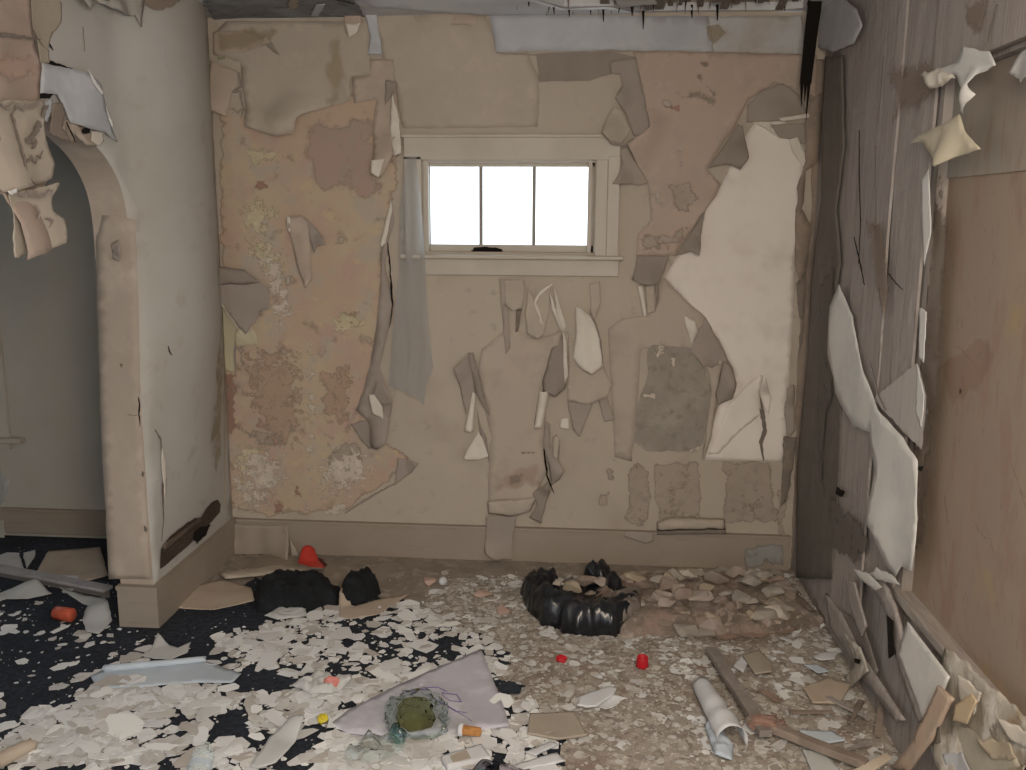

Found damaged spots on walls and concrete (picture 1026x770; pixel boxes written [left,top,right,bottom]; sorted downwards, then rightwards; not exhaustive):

peeling [0,0,67,260]
spalling [62,119,104,147]
peeling [96,215,221,579]
peeling [219,216,325,513]
peeling [316,201,394,515]
peeling [203,0,805,55]
peeling [525,281,614,436]
peeling [626,120,805,526]
peeling [827,284,927,585]
peeling [922,169,932,266]
peeling [1009,49,1026,82]
spalling [891,622,1026,770]